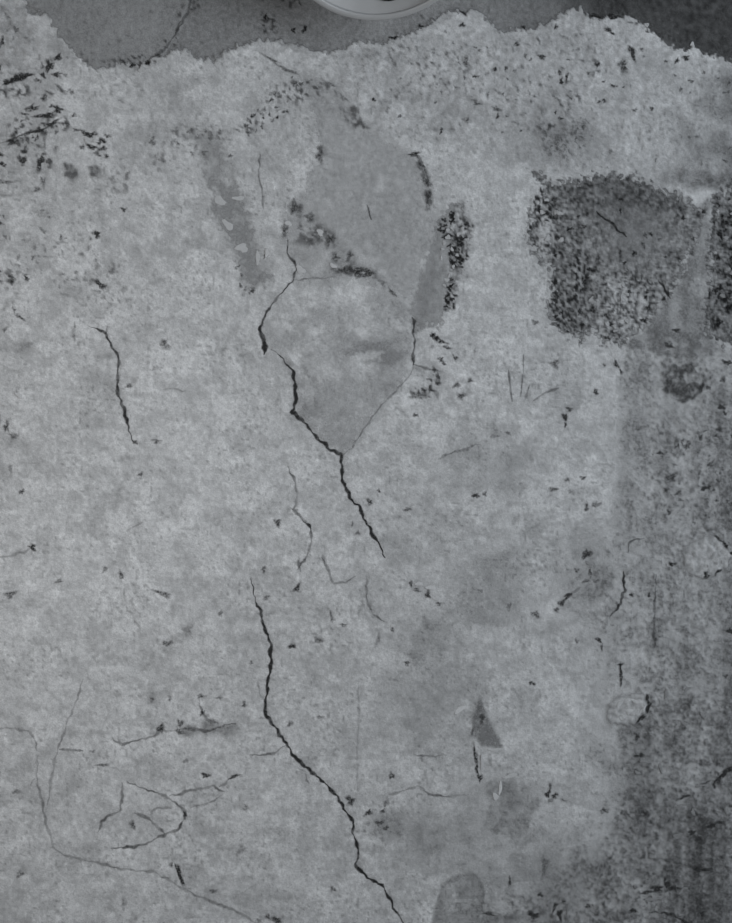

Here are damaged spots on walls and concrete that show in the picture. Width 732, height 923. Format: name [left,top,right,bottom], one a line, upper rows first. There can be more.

flaking render [1,0,732,170]
peeling [204,145,273,294]
crack [87,324,138,445]
crack [258,245,385,558]
leakage [647,244,722,430]
crack [250,578,404,923]
leakage [620,544,732,785]
leakage [595,778,732,923]